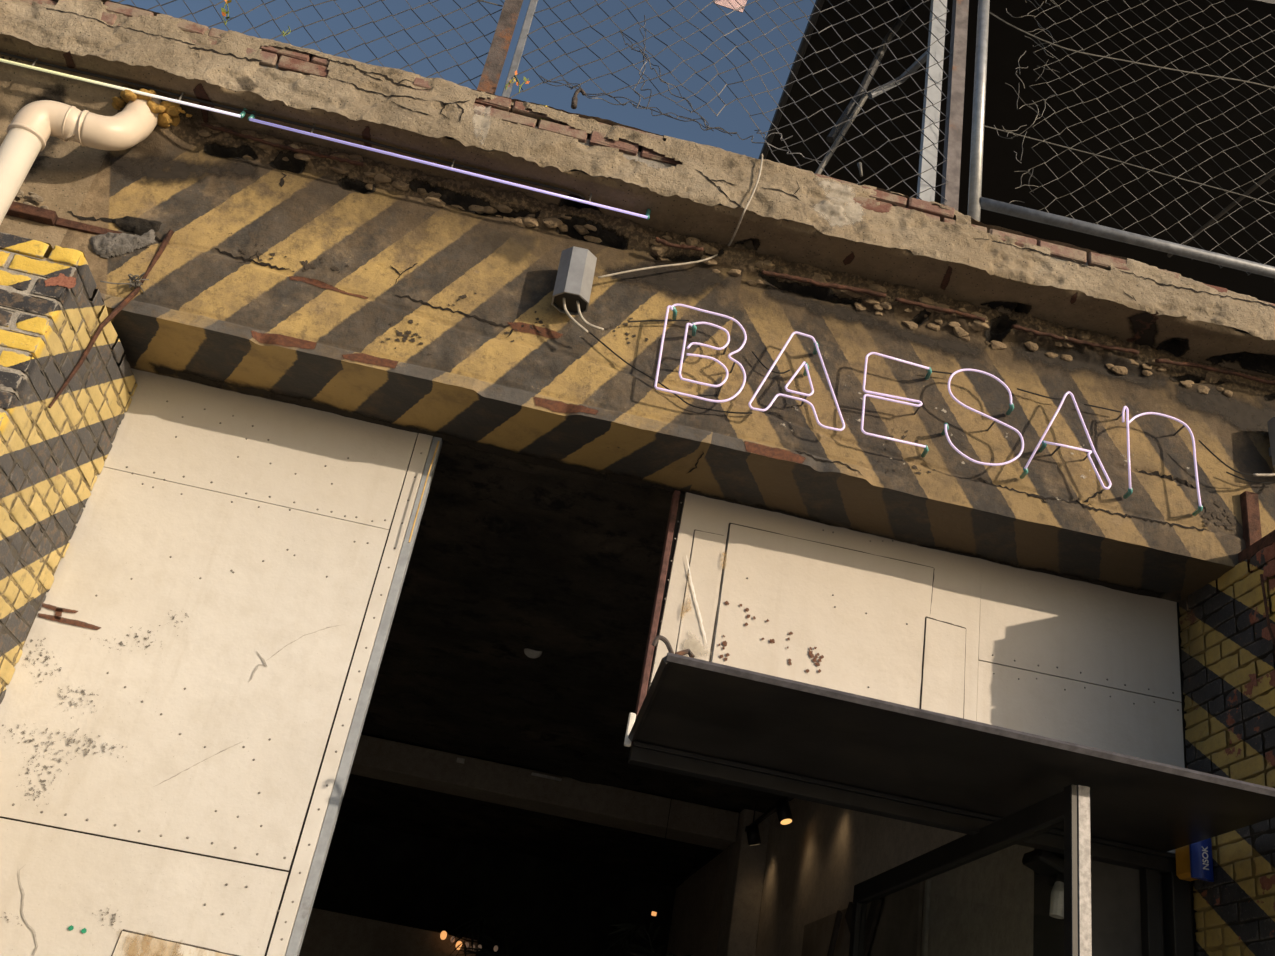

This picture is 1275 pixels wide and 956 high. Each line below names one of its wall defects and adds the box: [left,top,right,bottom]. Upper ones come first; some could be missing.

crack [326,59,469,121]
spalling [198,125,629,250]
crack [695,169,801,208]
crack [67,211,169,258]
crack [215,248,289,270]
spalling [649,235,1275,401]
crack [1136,469,1200,490]
crack [959,477,1213,532]
rust [38,603,101,630]